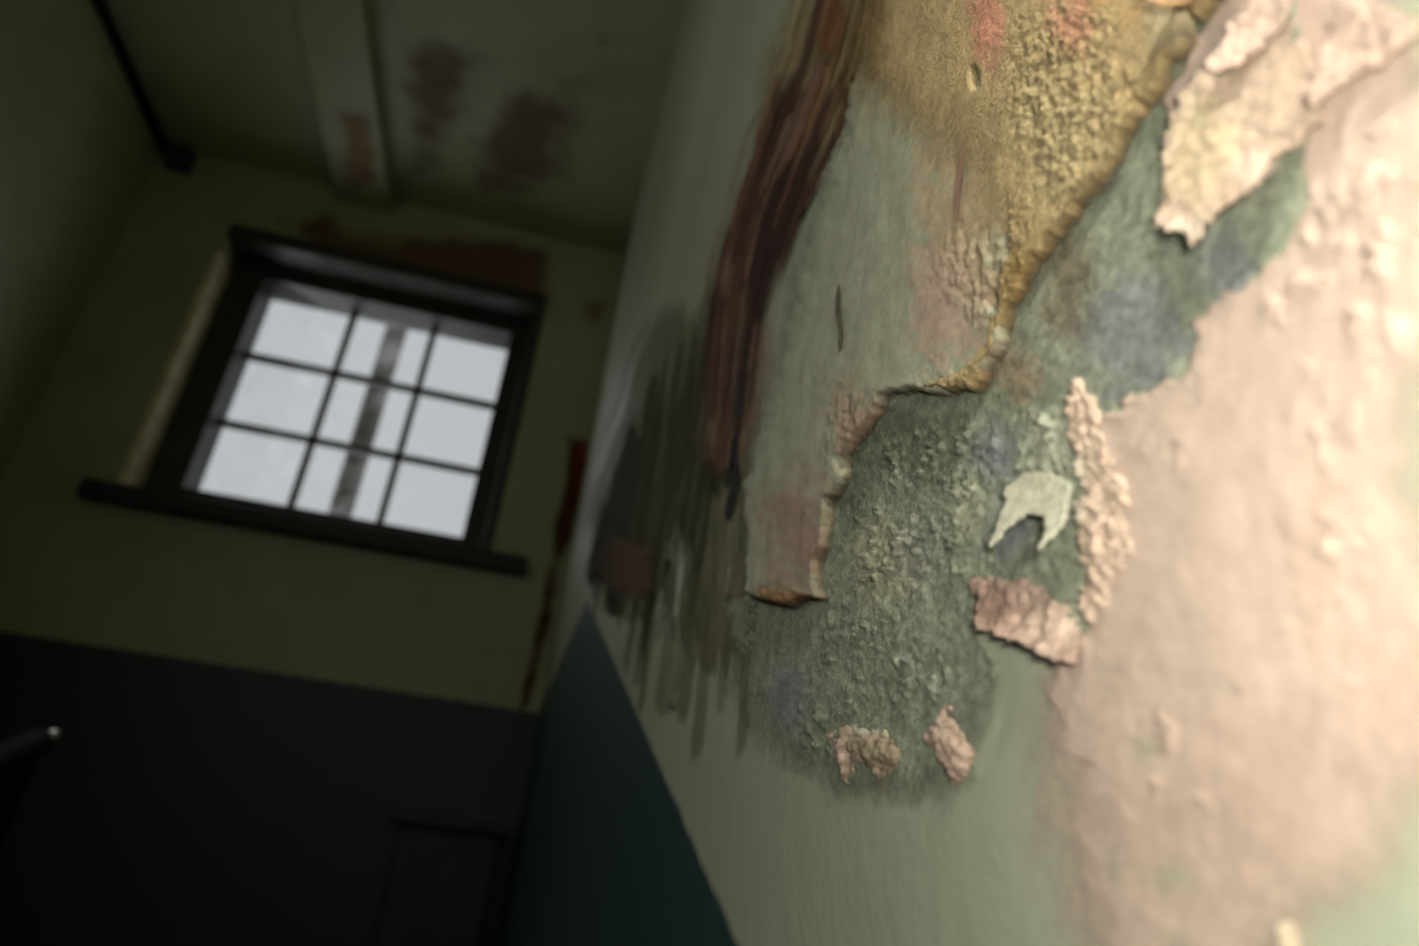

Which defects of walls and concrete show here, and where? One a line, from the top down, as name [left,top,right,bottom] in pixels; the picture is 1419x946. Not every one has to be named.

peeling [827,725,900,788]
peeling [742,0,1016,607]
peeling [923,704,975,786]
flaking render [967,0,1419,946]